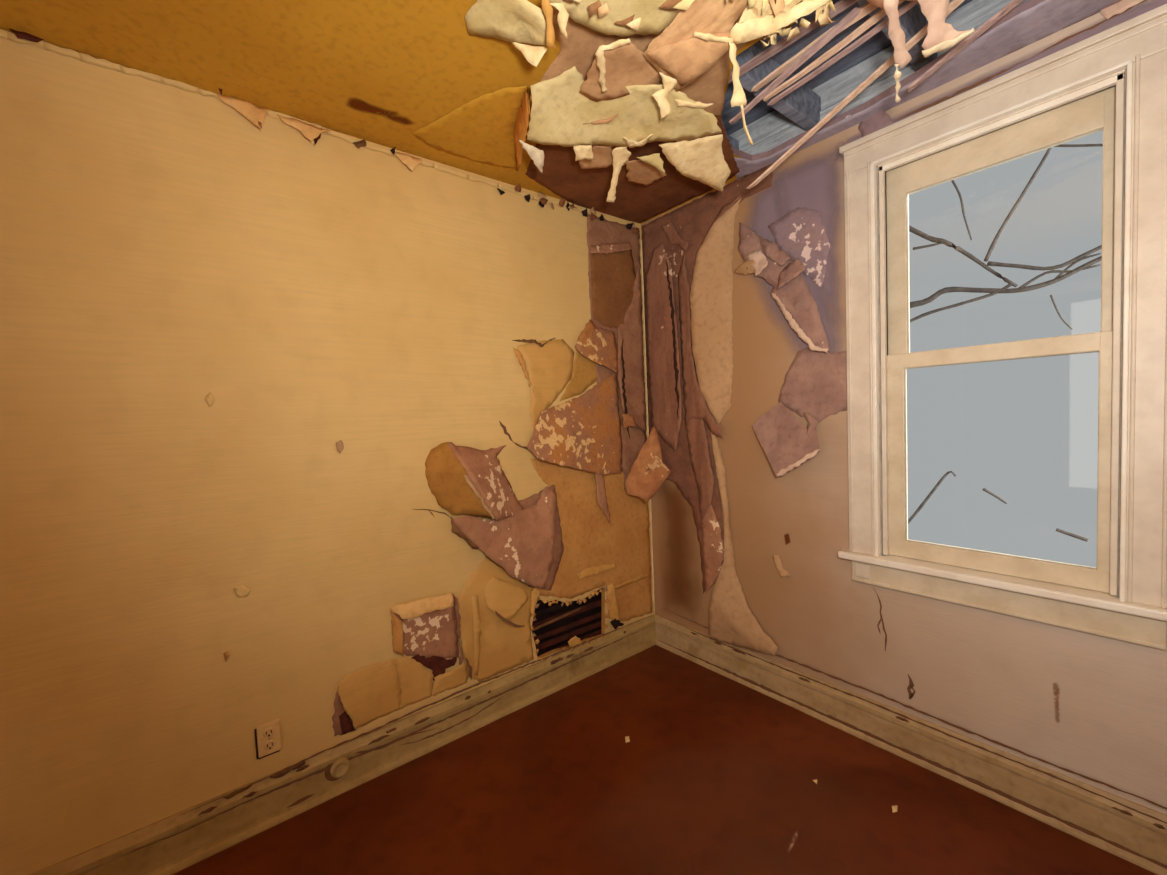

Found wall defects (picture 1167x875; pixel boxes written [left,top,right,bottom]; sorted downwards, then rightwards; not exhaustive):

flaking render [791,0,1147,155]
peeling [132,0,836,852]
peeling [778,348,847,423]
crack [874,589,887,651]
crack [658,640,1167,869]